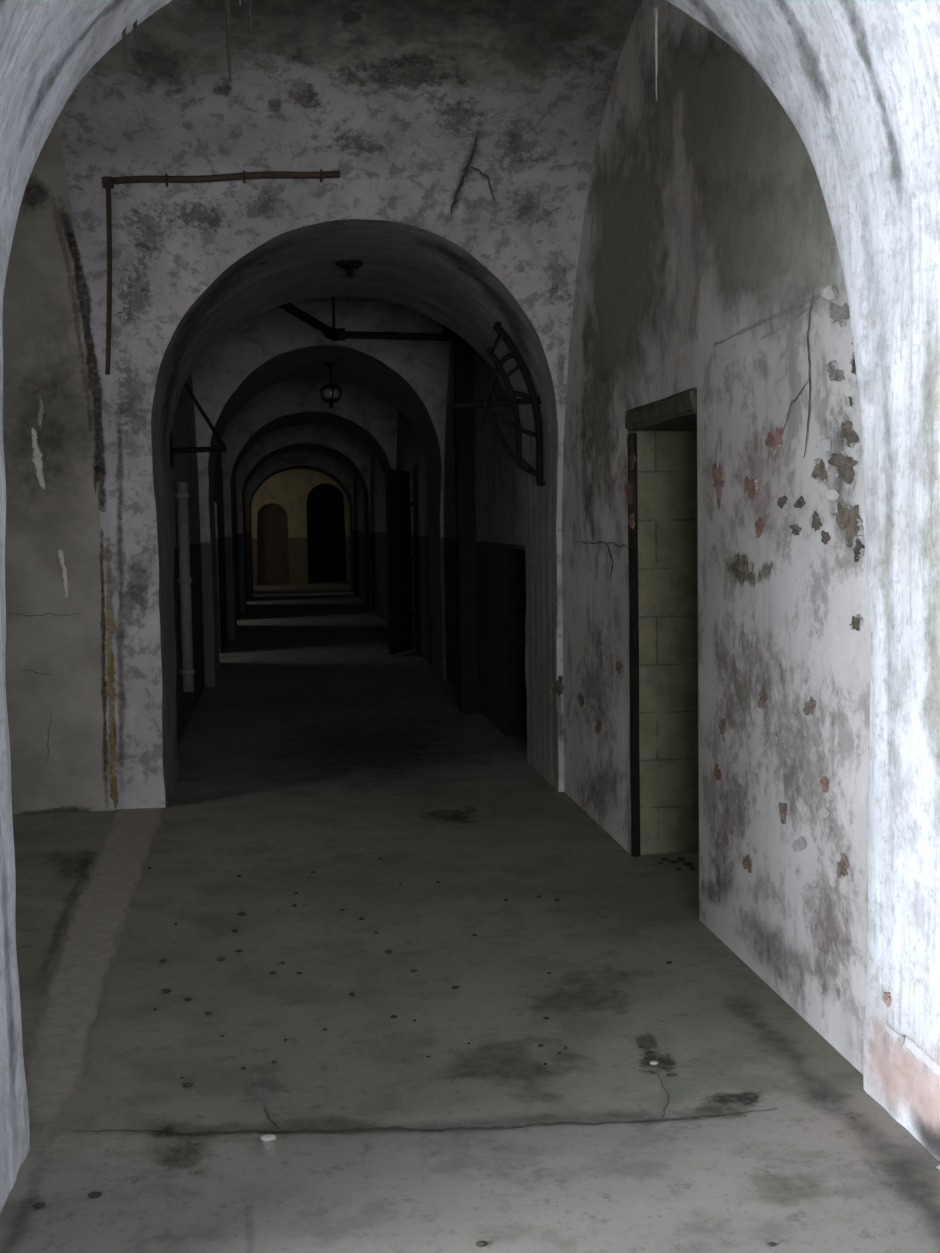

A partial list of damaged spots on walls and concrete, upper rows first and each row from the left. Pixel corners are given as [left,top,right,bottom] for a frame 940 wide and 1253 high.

damp [777,0,828,99]
damp [844,0,900,183]
damp [919,1126,940,1161]